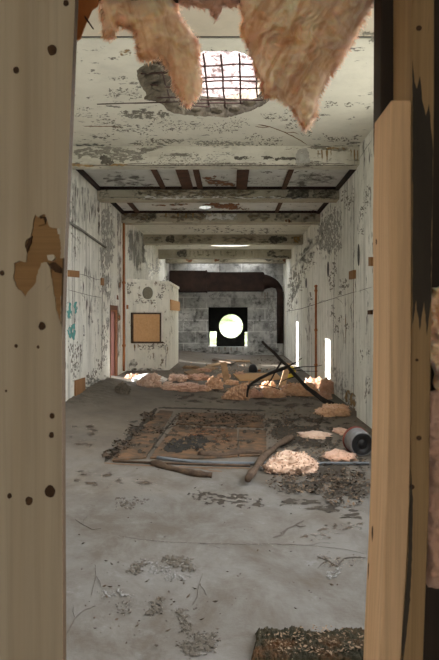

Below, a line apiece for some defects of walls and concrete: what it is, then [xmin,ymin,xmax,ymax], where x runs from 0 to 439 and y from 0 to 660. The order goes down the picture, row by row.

spalling [74,50,335,166]
peeling [100,207,115,298]
peeling [287,190,354,312]
peeling [68,341,82,377]